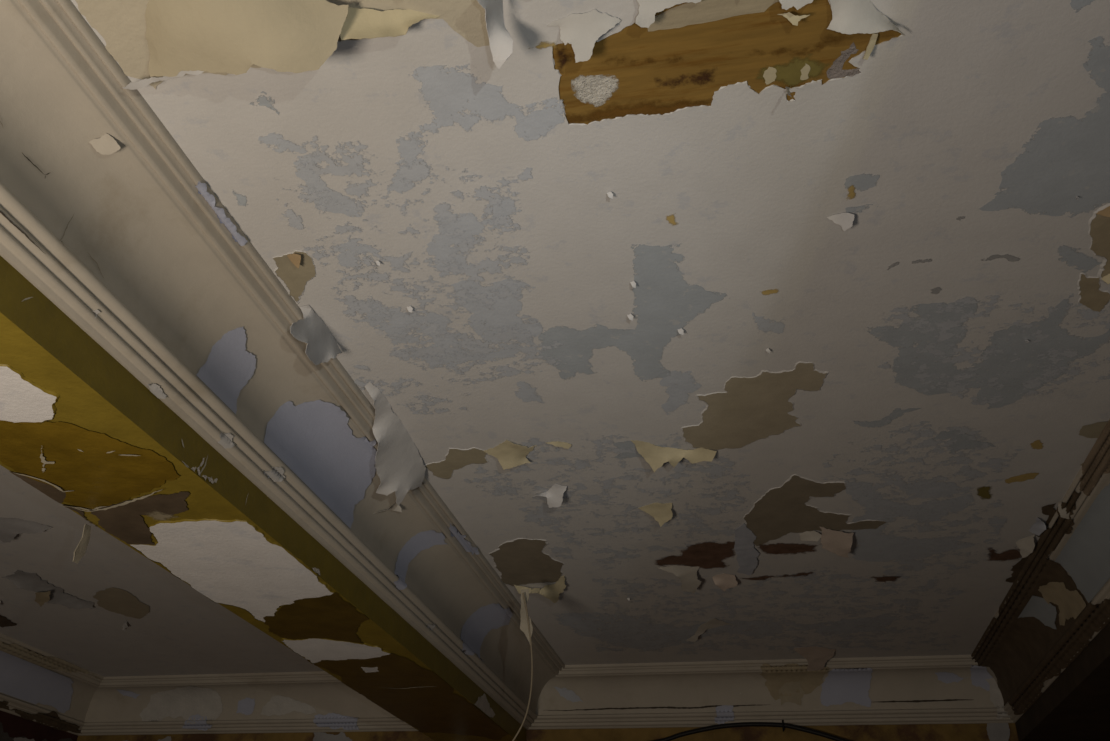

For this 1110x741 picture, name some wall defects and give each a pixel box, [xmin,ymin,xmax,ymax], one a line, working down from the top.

peeling [75,0,513,90]
peeling [547,9,621,63]
peeling [635,0,701,28]
peeling [777,0,813,26]
peeling [827,0,906,36]
peeling [867,36,1110,409]
peeling [258,64,727,529]
peeling [0,364,60,425]
peeling [611,361,830,472]
peeling [743,474,887,558]
peeling [0,471,508,741]
peeling [971,420,1110,741]